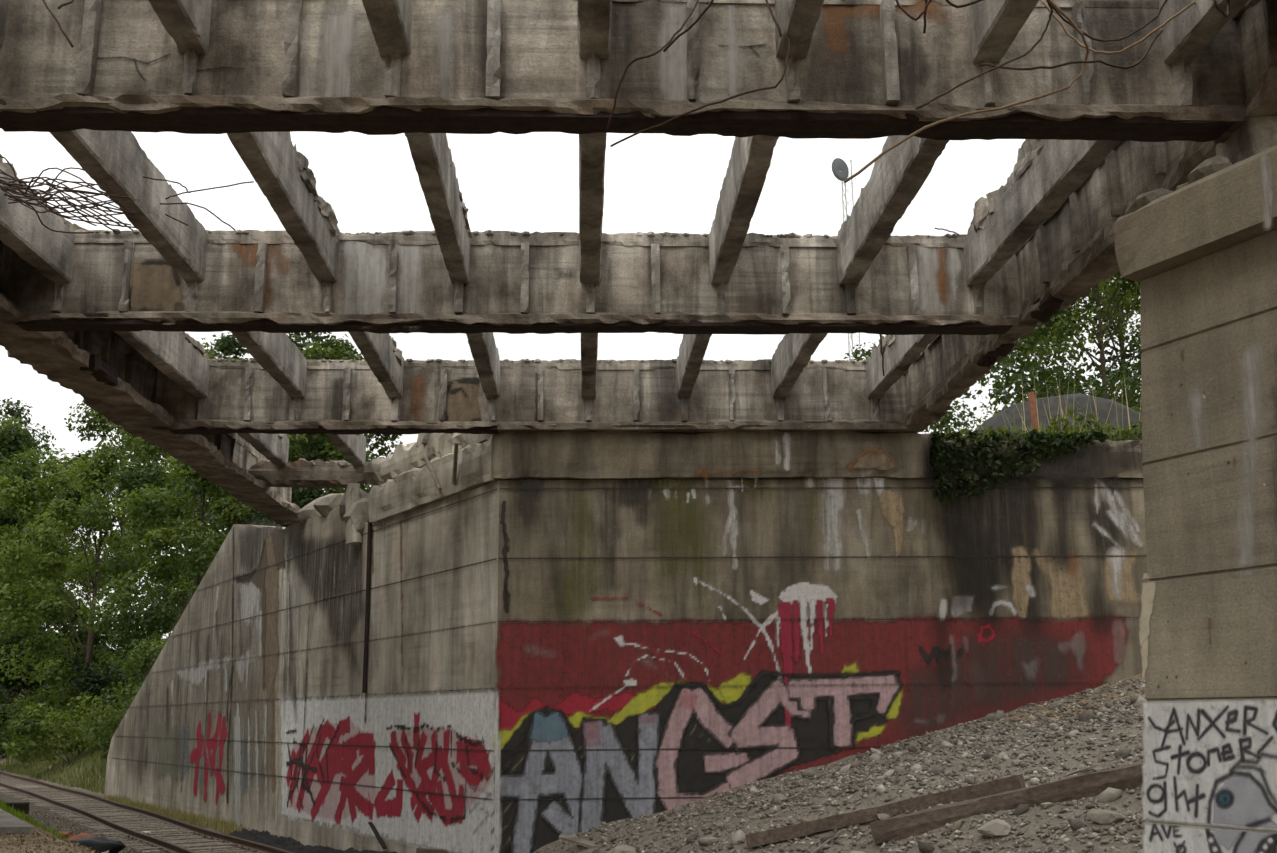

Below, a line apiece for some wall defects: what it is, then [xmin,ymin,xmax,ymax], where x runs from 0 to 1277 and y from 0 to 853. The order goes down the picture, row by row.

spalling [0,156,140,234]
water stain [604,478,709,585]
water stain [723,478,763,569]
water stain [808,478,884,570]
water stain [913,438,1144,733]